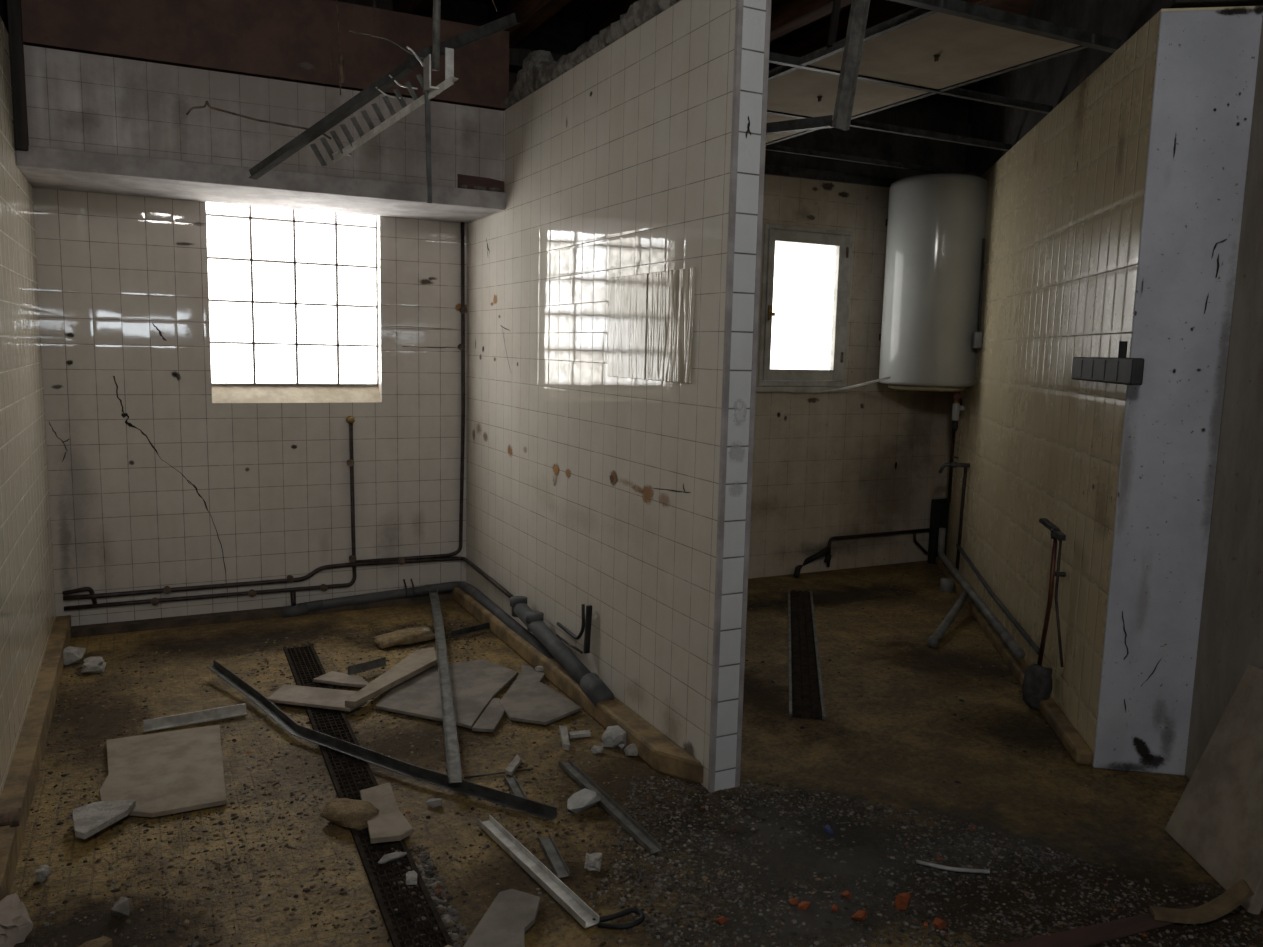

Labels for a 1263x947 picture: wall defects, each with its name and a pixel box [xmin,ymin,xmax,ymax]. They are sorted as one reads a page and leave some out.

spalling [504,0,680,109]
crack [113,376,228,599]
rust [633,485,653,503]